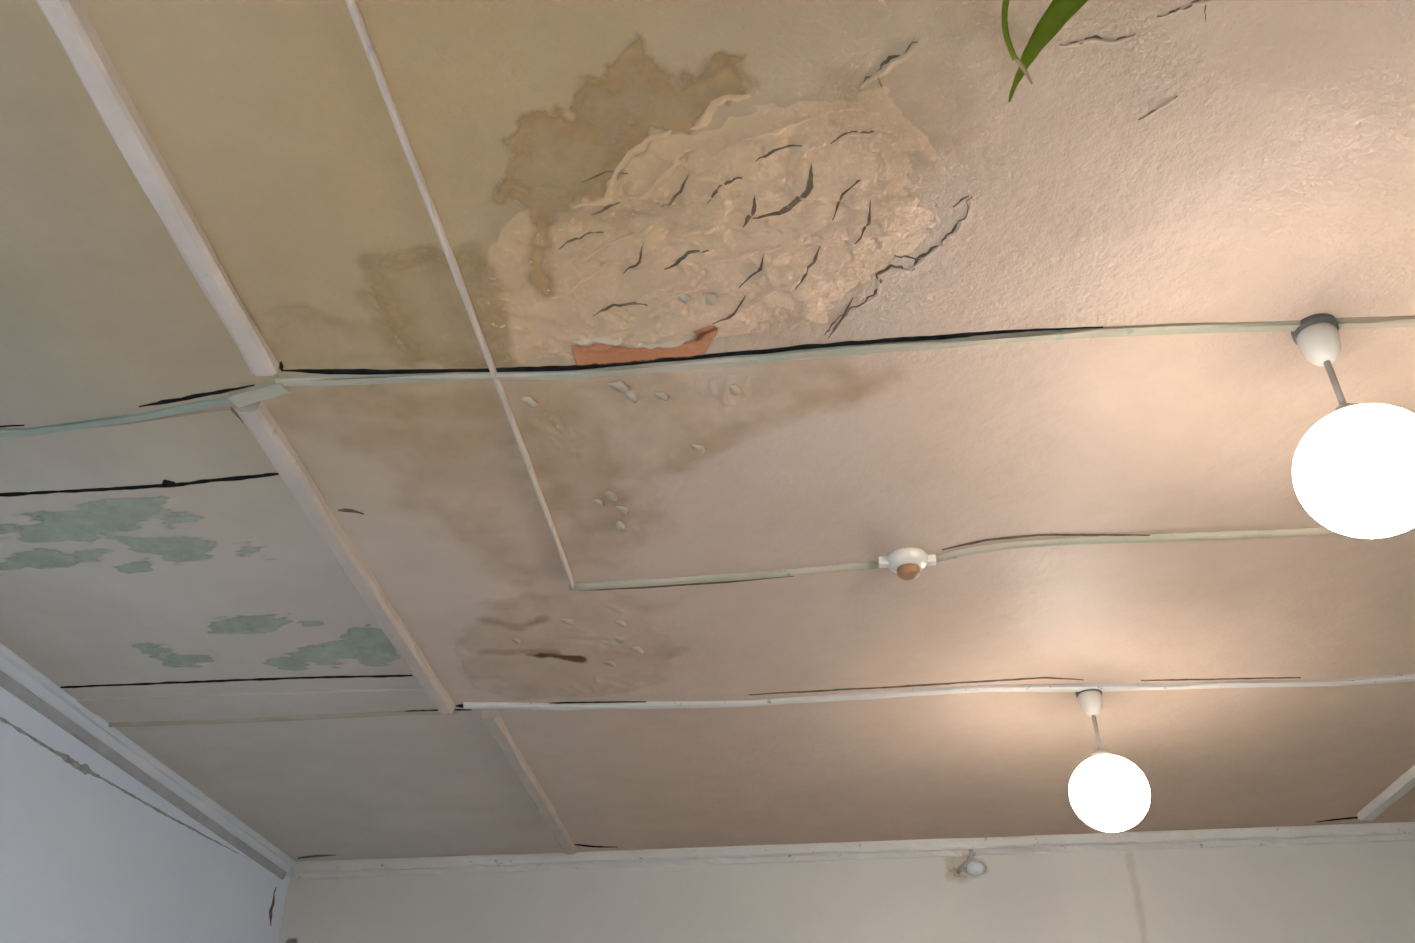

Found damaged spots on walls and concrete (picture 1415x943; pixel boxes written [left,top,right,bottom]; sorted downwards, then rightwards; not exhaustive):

crack [1060,0,1218,48]
crack [857,41,920,91]
peeling [0,497,215,573]
peeling [208,614,322,634]
peeling [265,625,400,670]